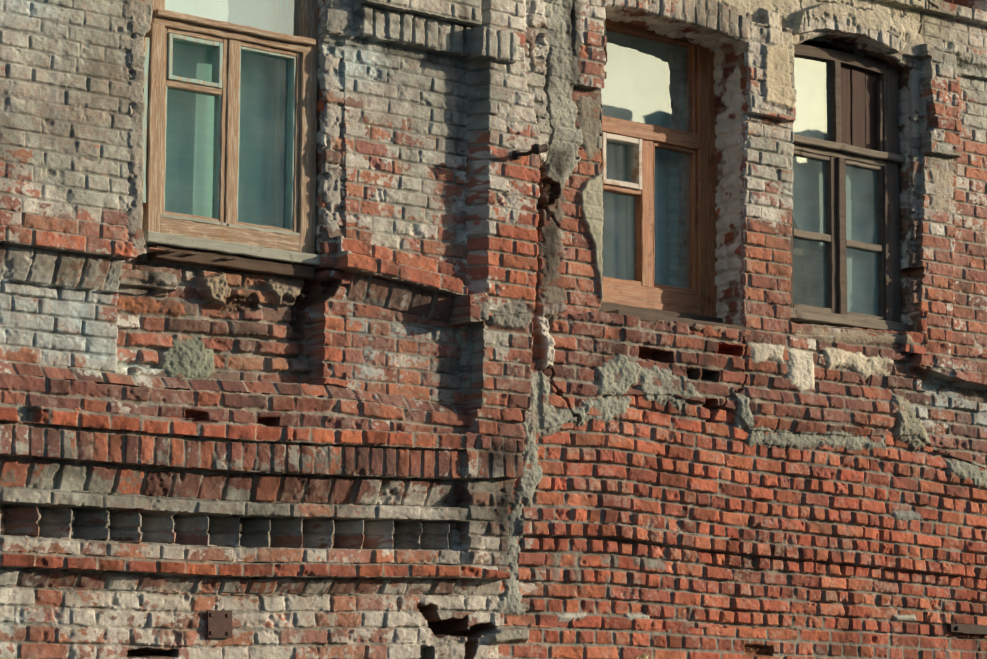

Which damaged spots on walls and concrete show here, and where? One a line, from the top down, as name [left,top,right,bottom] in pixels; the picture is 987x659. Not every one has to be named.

crack [534,45,562,313]
crack [705,335,749,423]
spalling [184,407,219,424]
spalling [256,414,290,429]
spalling [126,646,180,659]